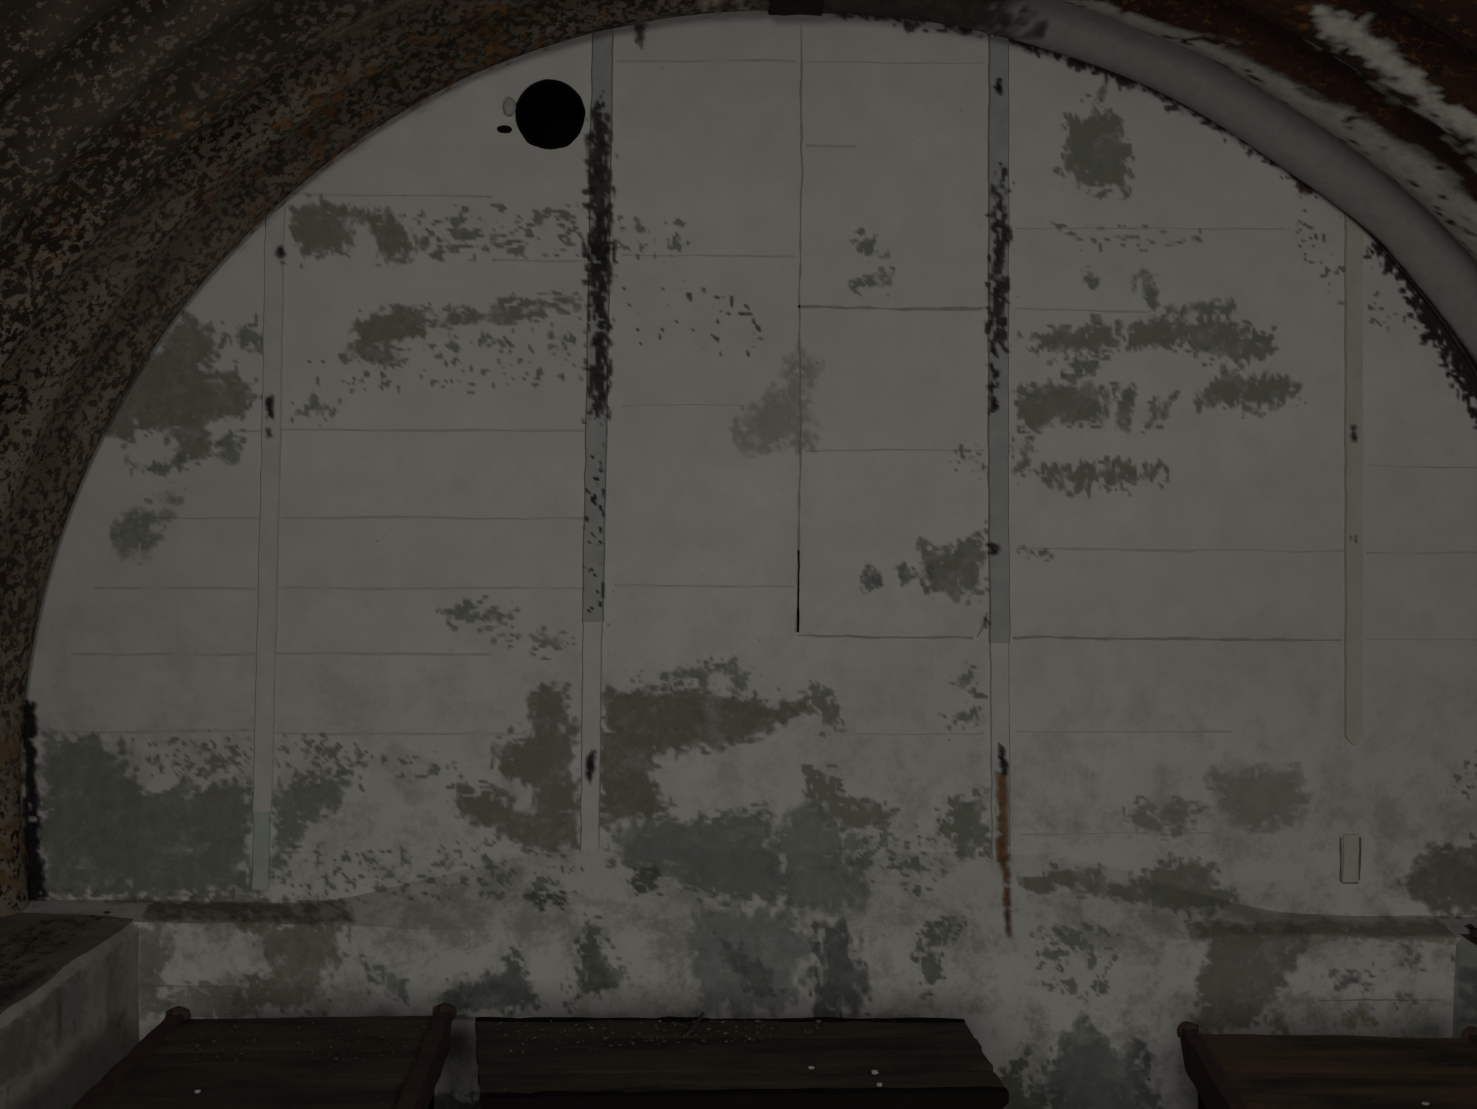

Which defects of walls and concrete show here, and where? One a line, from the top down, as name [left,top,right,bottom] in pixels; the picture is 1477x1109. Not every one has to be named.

peeling [289,197,584,267]
peeling [291,292,586,421]
damp [582,101,617,424]
damp [985,163,1012,414]
peeling [992,34,1299,197]
peeling [1013,271,1300,496]
corrosion [1292,175,1314,193]
spalling [1365,242,1477,428]
damp [38,733,354,1029]
damp [692,801,869,1019]
corrosion [996,745,1010,935]
damp [1188,833,1477,1033]